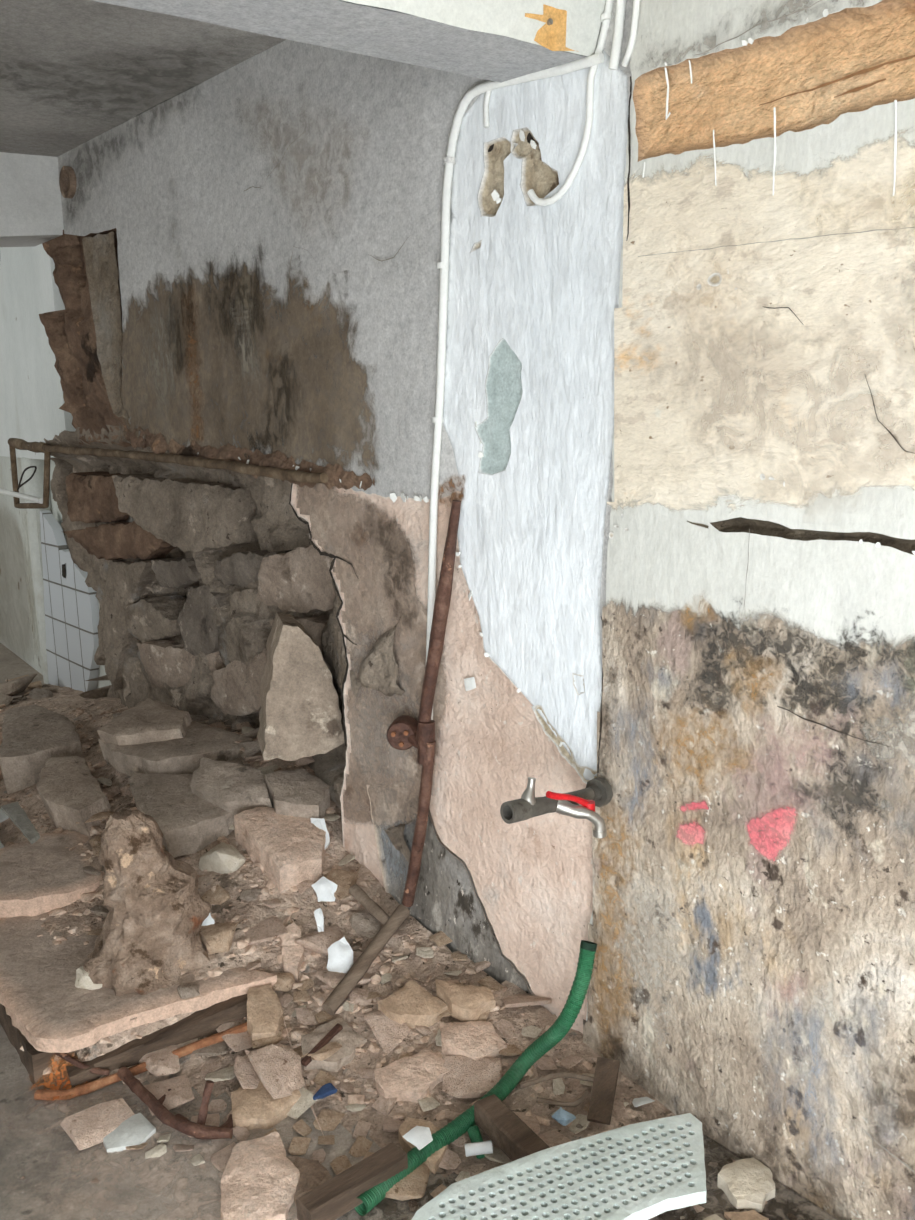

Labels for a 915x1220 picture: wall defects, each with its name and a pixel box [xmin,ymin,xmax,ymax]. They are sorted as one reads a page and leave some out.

damp [115,262,378,471]
peeling [478,128,559,217]
peeling [607,0,915,539]
peeling [82,232,598,1017]
crack [687,517,915,606]
crack [777,706,889,747]
peeling [571,994,587,1034]
damp [583,601,915,1220]